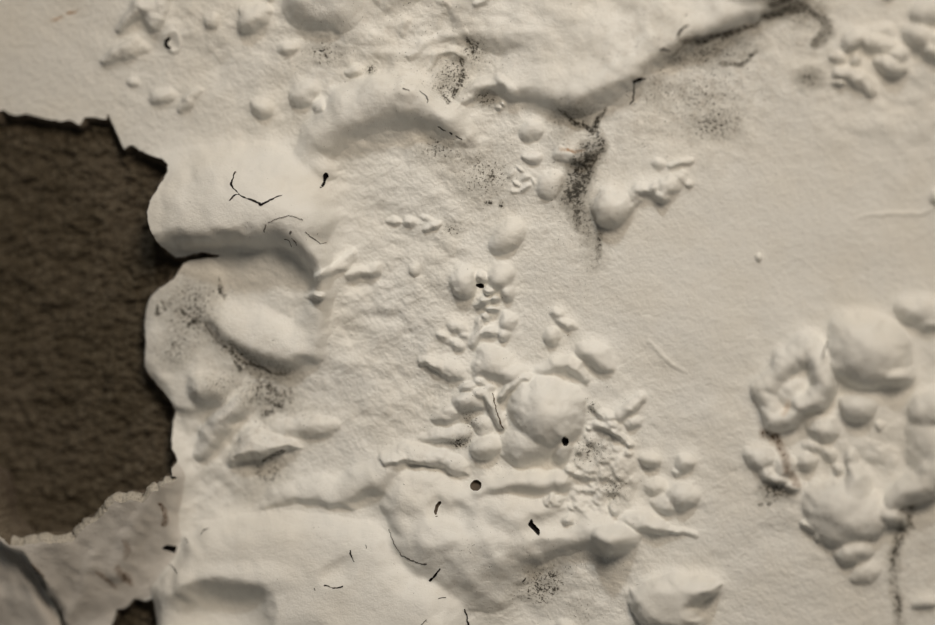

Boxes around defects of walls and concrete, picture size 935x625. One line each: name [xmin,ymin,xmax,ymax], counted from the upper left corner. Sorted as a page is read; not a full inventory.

water stain [561,105,606,259]
spalling [0,110,251,625]
water stain [152,278,302,417]